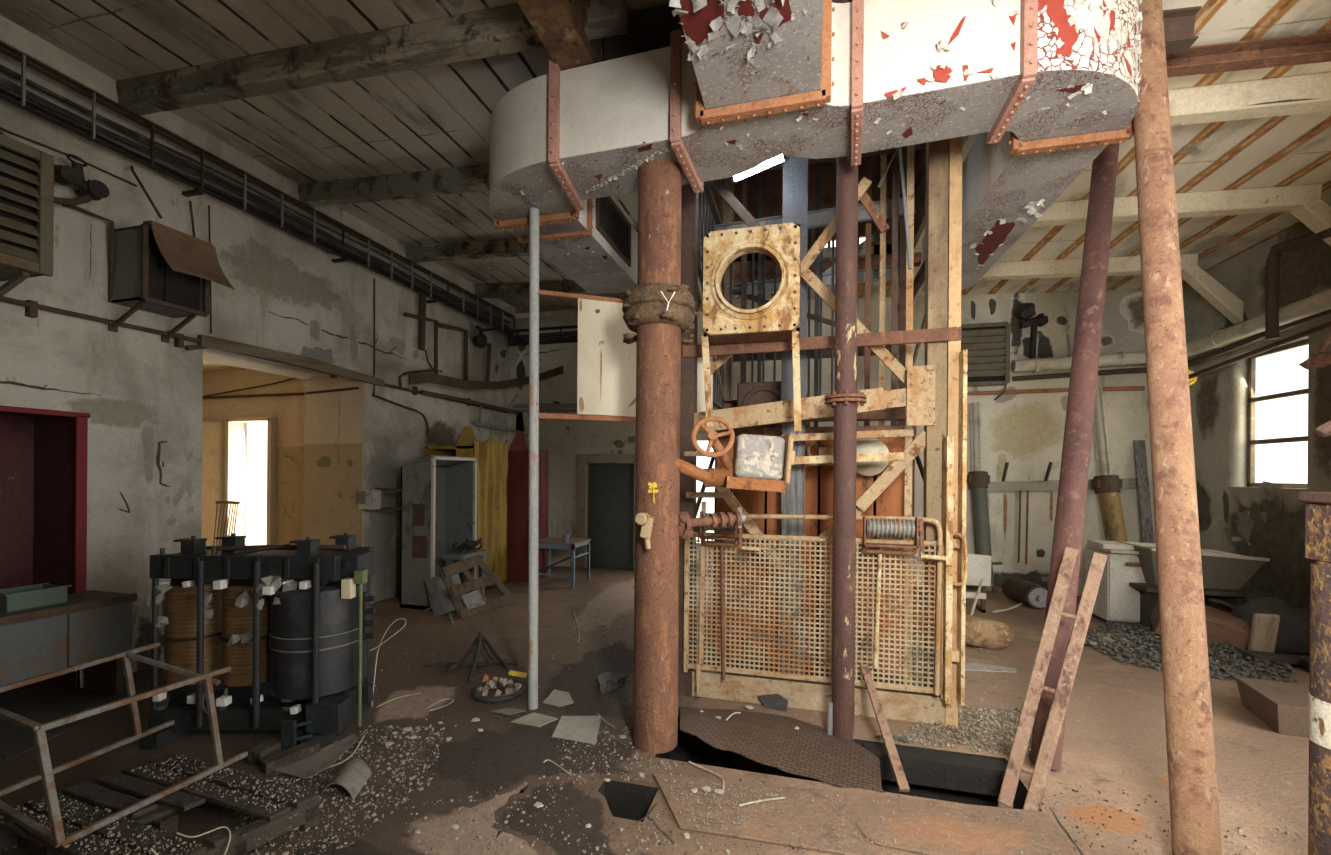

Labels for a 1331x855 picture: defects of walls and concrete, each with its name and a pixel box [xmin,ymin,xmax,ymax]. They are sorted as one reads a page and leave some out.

peeling [992,0,1020,26]
peeling [669,0,807,64]
peeling [884,16,1002,100]
peeling [1038,0,1142,102]
peeling [1056,83,1112,115]
peeling [874,116,913,139]
peeling [970,199,1045,269]
crack [0,381,102,396]
corrosion [1054,802,1157,839]